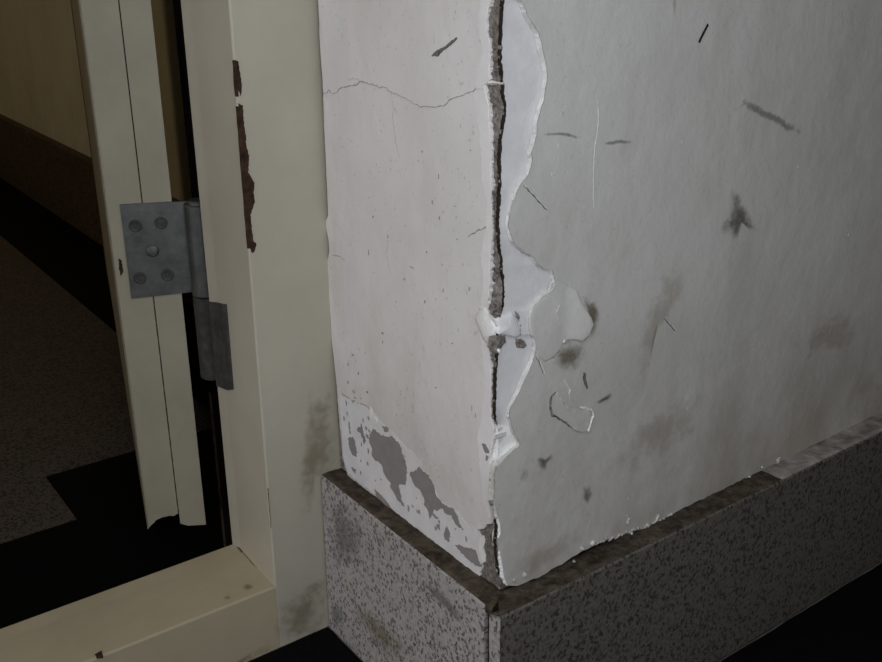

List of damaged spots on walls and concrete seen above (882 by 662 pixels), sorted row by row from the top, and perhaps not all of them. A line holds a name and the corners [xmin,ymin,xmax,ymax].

crack [323,78,477,155]
spalling [232,60,256,253]
peeling [340,0,556,586]
peeling [549,380,594,432]
flaking render [580,512,674,551]